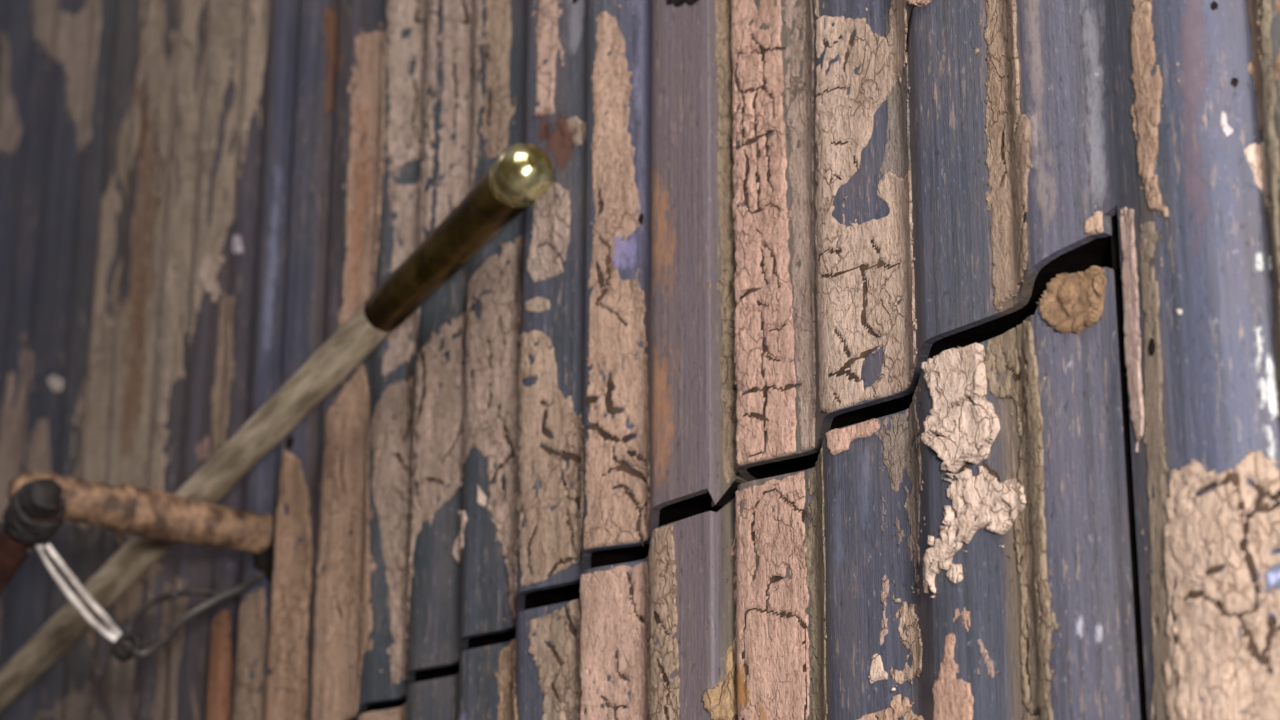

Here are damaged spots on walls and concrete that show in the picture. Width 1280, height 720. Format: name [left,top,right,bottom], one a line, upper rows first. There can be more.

peeling [0,0,680,720]
crack [366,30,914,720]
peeling [702,0,1280,720]
crack [1000,118,1025,223]
crack [928,214,1280,720]